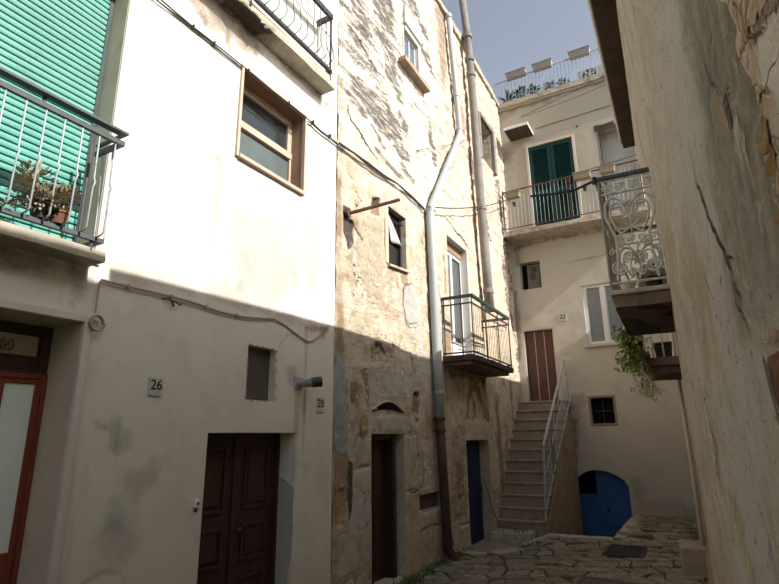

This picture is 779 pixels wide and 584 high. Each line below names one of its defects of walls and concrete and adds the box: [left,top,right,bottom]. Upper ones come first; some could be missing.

crack [346,101,379,165]
flaking render [719,0,779,223]
crack [688,142,750,337]
flaking render [763,329,779,416]